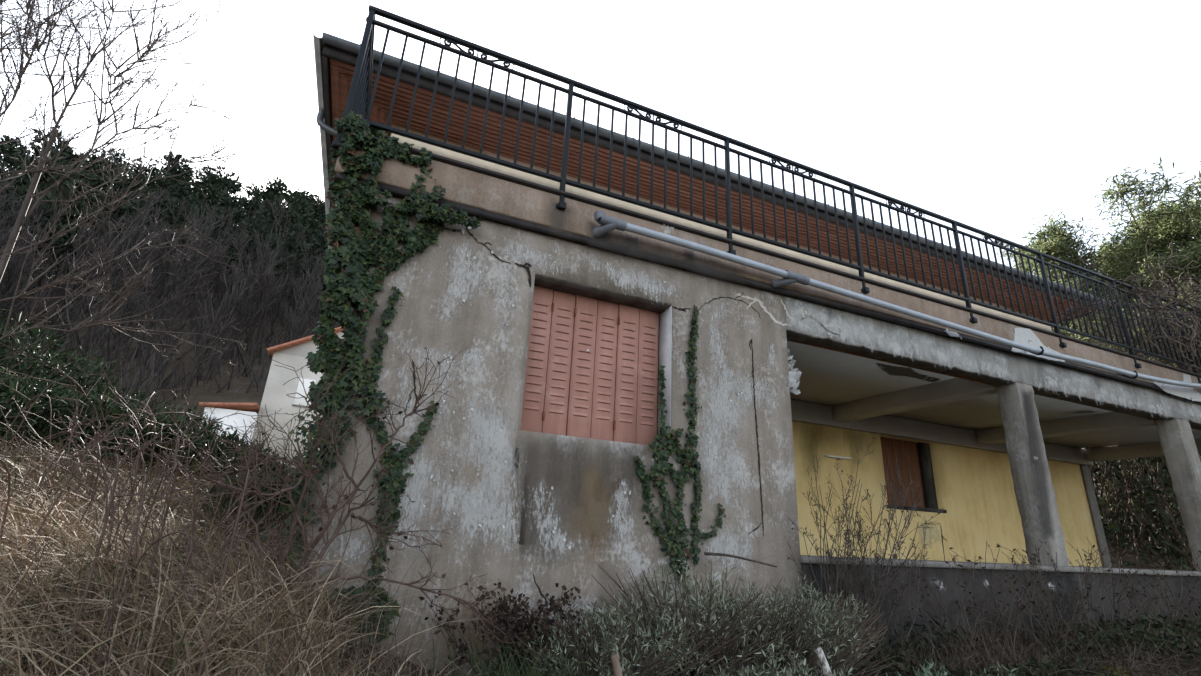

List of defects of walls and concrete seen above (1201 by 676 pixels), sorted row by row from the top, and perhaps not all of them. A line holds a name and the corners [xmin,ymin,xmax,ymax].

crack [443,224,531,287]
crack [672,292,840,536]
damp [531,450,635,548]